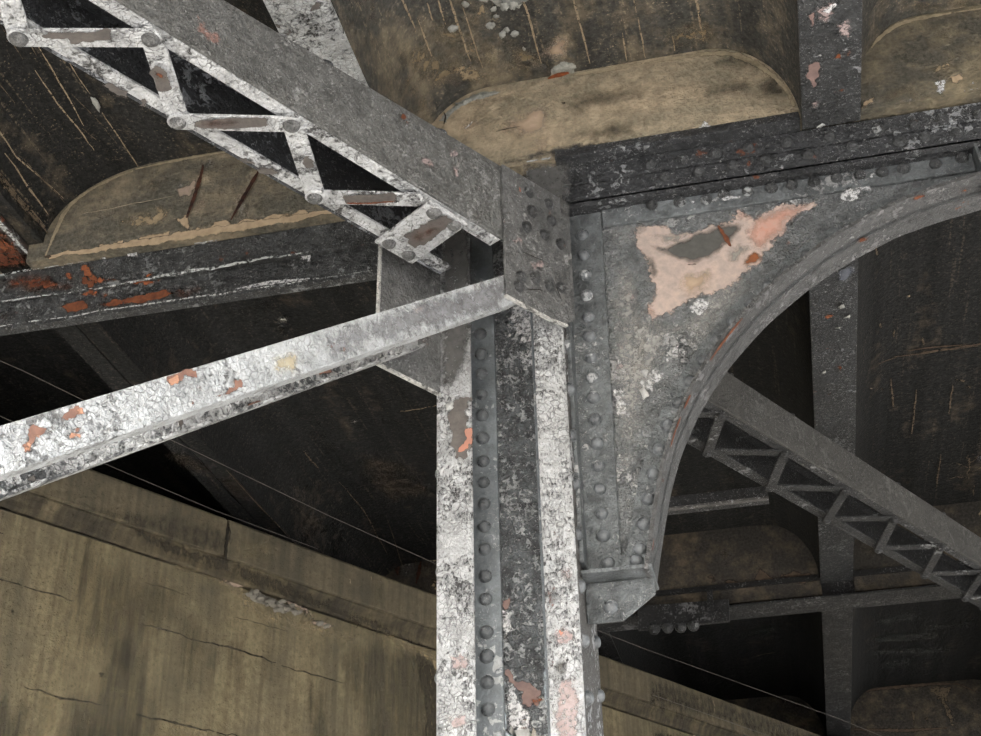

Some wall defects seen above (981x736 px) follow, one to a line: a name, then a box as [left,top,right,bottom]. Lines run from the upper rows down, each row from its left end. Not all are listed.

spalling [461,0,529,50]
peeling [809,3,837,26]
peeling [806,54,822,88]
peeling [841,174,873,201]
corrosion [0,234,28,268]
corrosion [8,265,182,313]
peeling [614,196,817,430]
spalling [211,578,331,633]
crack [142,624,342,683]
crack [24,686,110,706]
peeling [504,661,579,736]
crack [141,715,238,736]